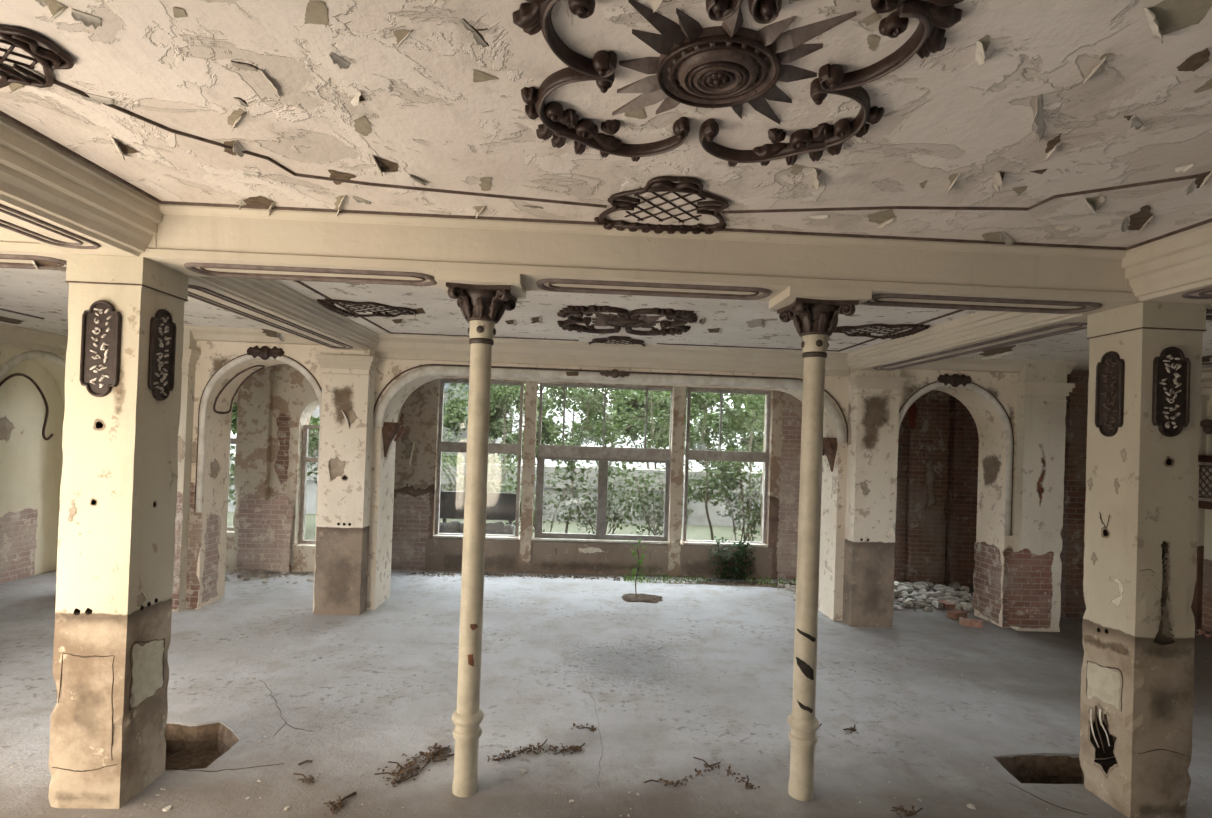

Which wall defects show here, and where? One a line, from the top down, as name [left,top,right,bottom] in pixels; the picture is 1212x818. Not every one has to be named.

peeling [34,0,102,30]
peeling [304,0,329,25]
peeling [1144,0,1212,44]
peeling [1177,48,1210,72]
peeling [111,138,139,161]
peeling [224,108,259,177]
peeling [328,170,372,217]
peeling [371,155,427,185]
flaking render [172,483,221,609]
flaking render [972,542,1054,629]
crack [165,680,313,772]
spalling [995,704,1119,784]